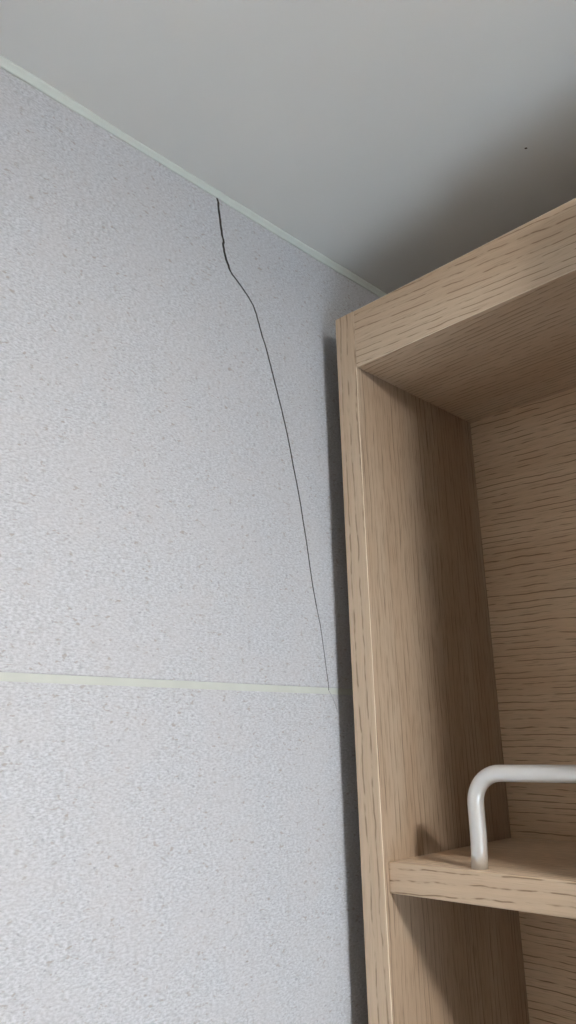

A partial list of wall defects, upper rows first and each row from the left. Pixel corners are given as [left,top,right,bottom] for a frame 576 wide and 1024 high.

crack [216,198,339,713]